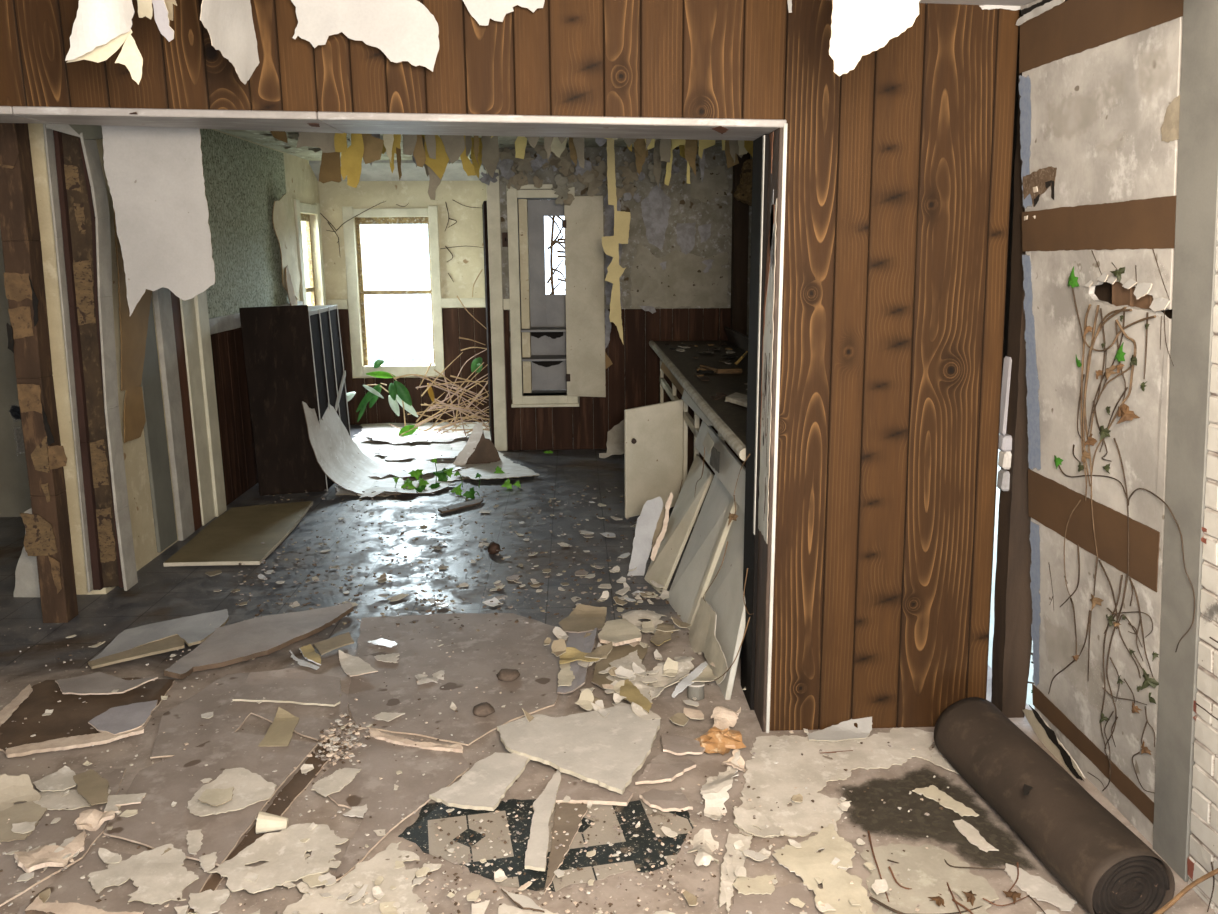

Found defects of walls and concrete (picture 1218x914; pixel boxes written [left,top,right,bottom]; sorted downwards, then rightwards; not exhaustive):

peeling [137,0,177,42]
peeling [463,0,545,26]
peeling [829,0,920,76]
peeling [980,0,1184,73]
peeling [645,126,748,185]
peeling [266,123,631,345]
flaking render [1084,272,1171,312]
leakage [842,768,1033,869]